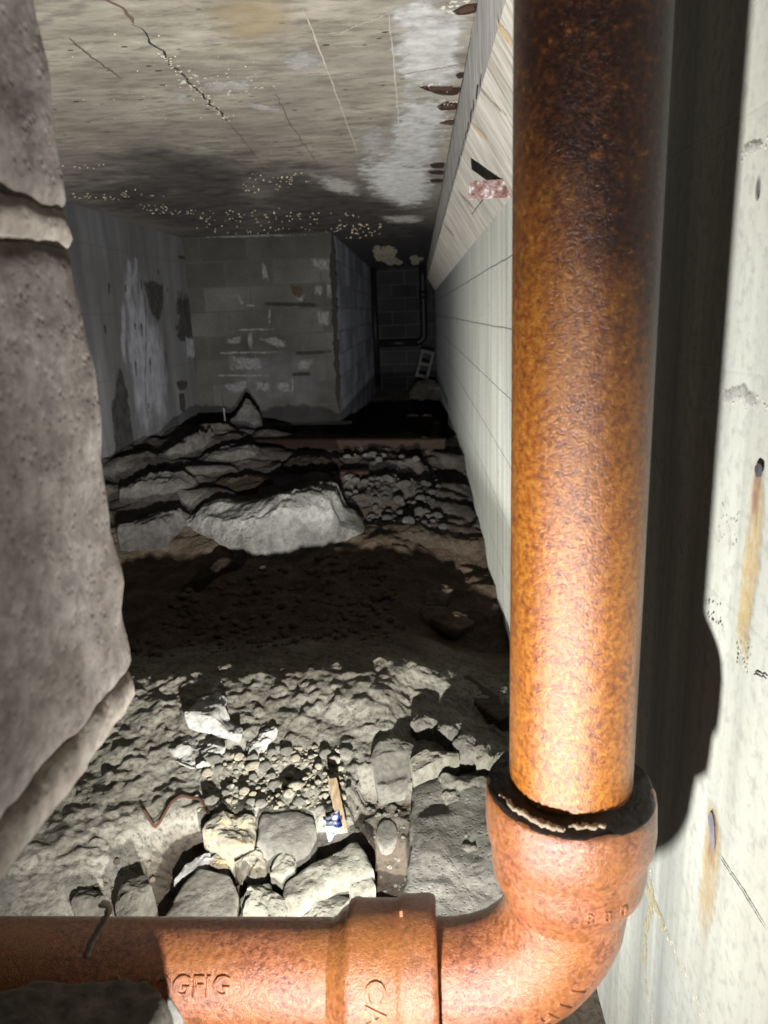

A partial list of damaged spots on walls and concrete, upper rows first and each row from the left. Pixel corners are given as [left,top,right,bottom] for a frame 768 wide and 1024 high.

crack [70,39,119,77]
crack [105,0,265,169]
water stain [93,1,466,239]
water stain [112,258,196,457]
corrosion [736,463,762,648]